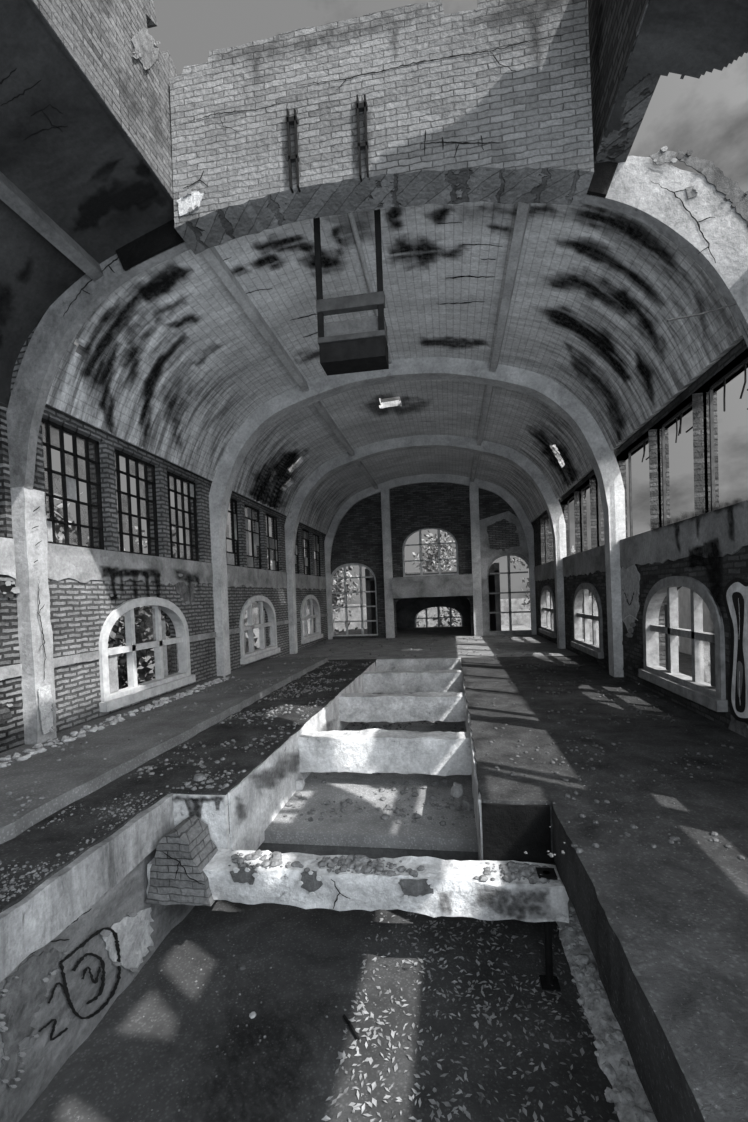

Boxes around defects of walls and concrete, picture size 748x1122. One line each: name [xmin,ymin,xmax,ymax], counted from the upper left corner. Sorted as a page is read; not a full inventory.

spalling [650,146,748,226]
damp [231,236,314,274]
damp [577,205,675,267]
damp [551,241,663,354]
damp [81,265,198,446]
damp [544,307,654,444]
flaking render [0,581,20,599]